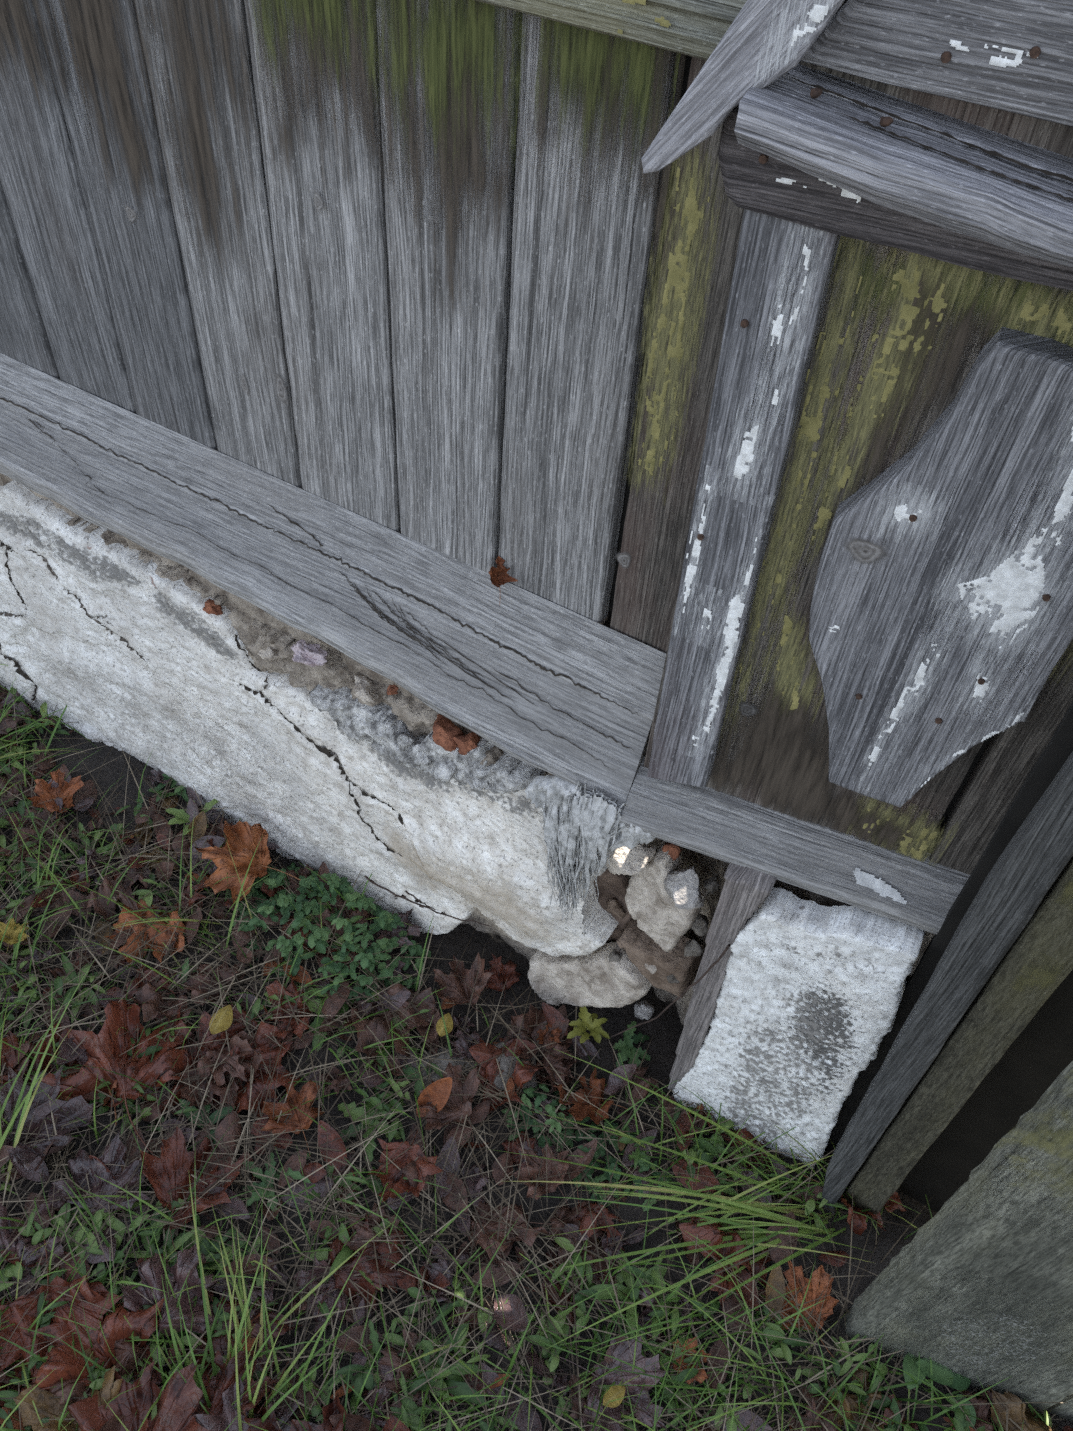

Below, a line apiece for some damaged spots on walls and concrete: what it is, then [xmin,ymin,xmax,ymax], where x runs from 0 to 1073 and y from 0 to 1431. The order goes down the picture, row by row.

peeling [949,40,1038,68]
peeling [776,178,861,203]
crack [0,398,637,771]
crack [235,634,405,857]
spalling [320,717,544,825]
peeling [633,151,718,487]
peeling [675,228,1073,752]
leakage [853,278,994,493]
peeling [848,418,1073,862]
peeling [853,867,907,905]
leakage [703,944,886,1146]